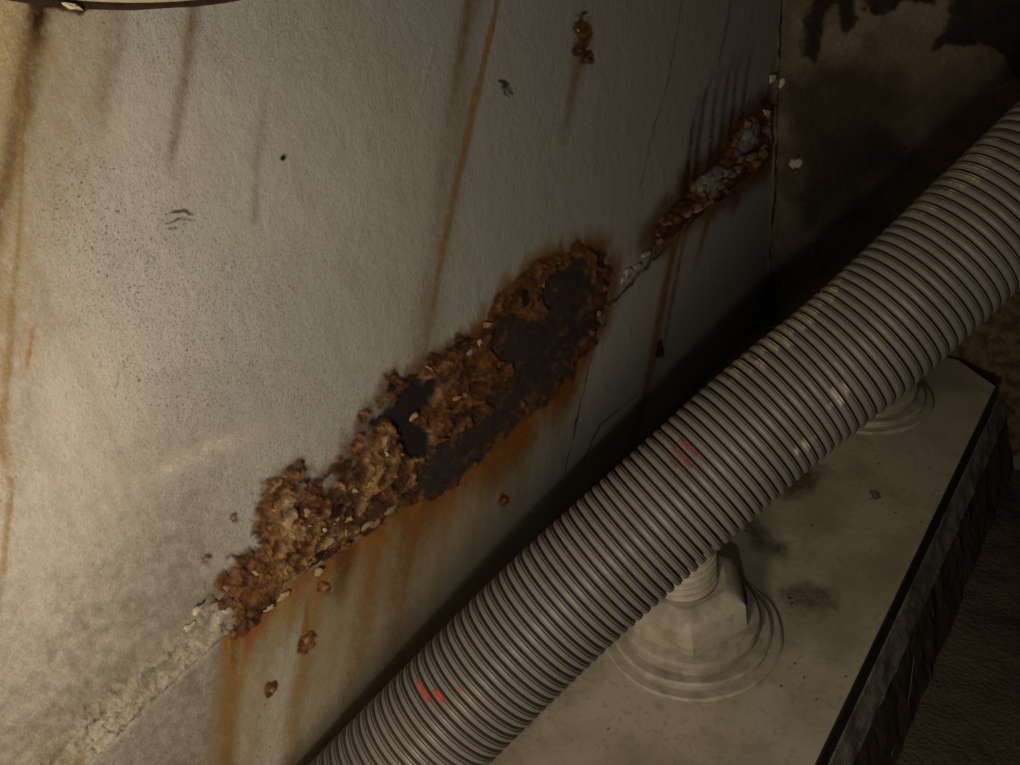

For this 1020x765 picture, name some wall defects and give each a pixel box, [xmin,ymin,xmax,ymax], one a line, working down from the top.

rust [572,12,594,80]
water stain [803,0,935,63]
water stain [933,0,1020,79]
rust [435,0,499,290]
rust [640,74,777,417]